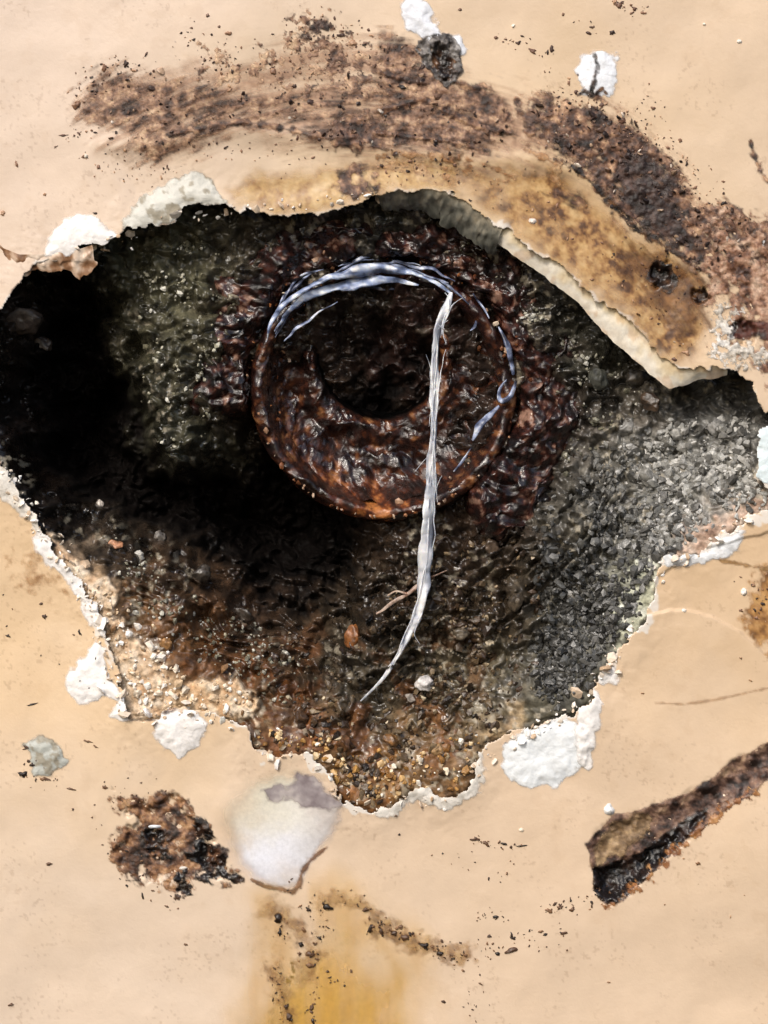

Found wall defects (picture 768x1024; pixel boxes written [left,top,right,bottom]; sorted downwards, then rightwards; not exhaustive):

damp [74,9,768,357]
damp [453,327,517,472]
corrosion [707,302,768,371]
damp [730,337,768,388]
spalling [0,171,768,818]
spalling [585,742,768,910]